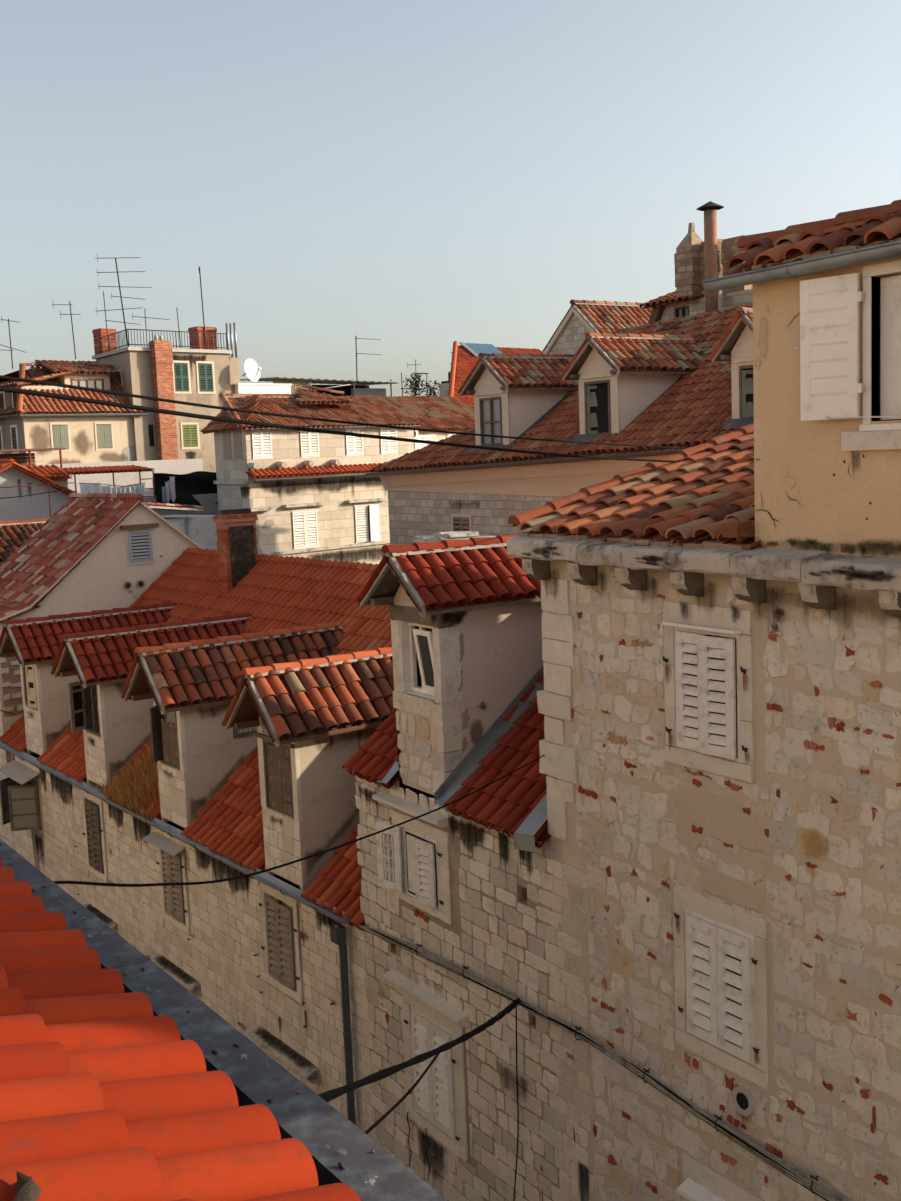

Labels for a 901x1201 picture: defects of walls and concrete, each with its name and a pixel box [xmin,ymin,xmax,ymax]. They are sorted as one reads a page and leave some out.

crack [755,491,802,525]
leakage [417,1129,443,1175]
leakage [578,1162,588,1201]